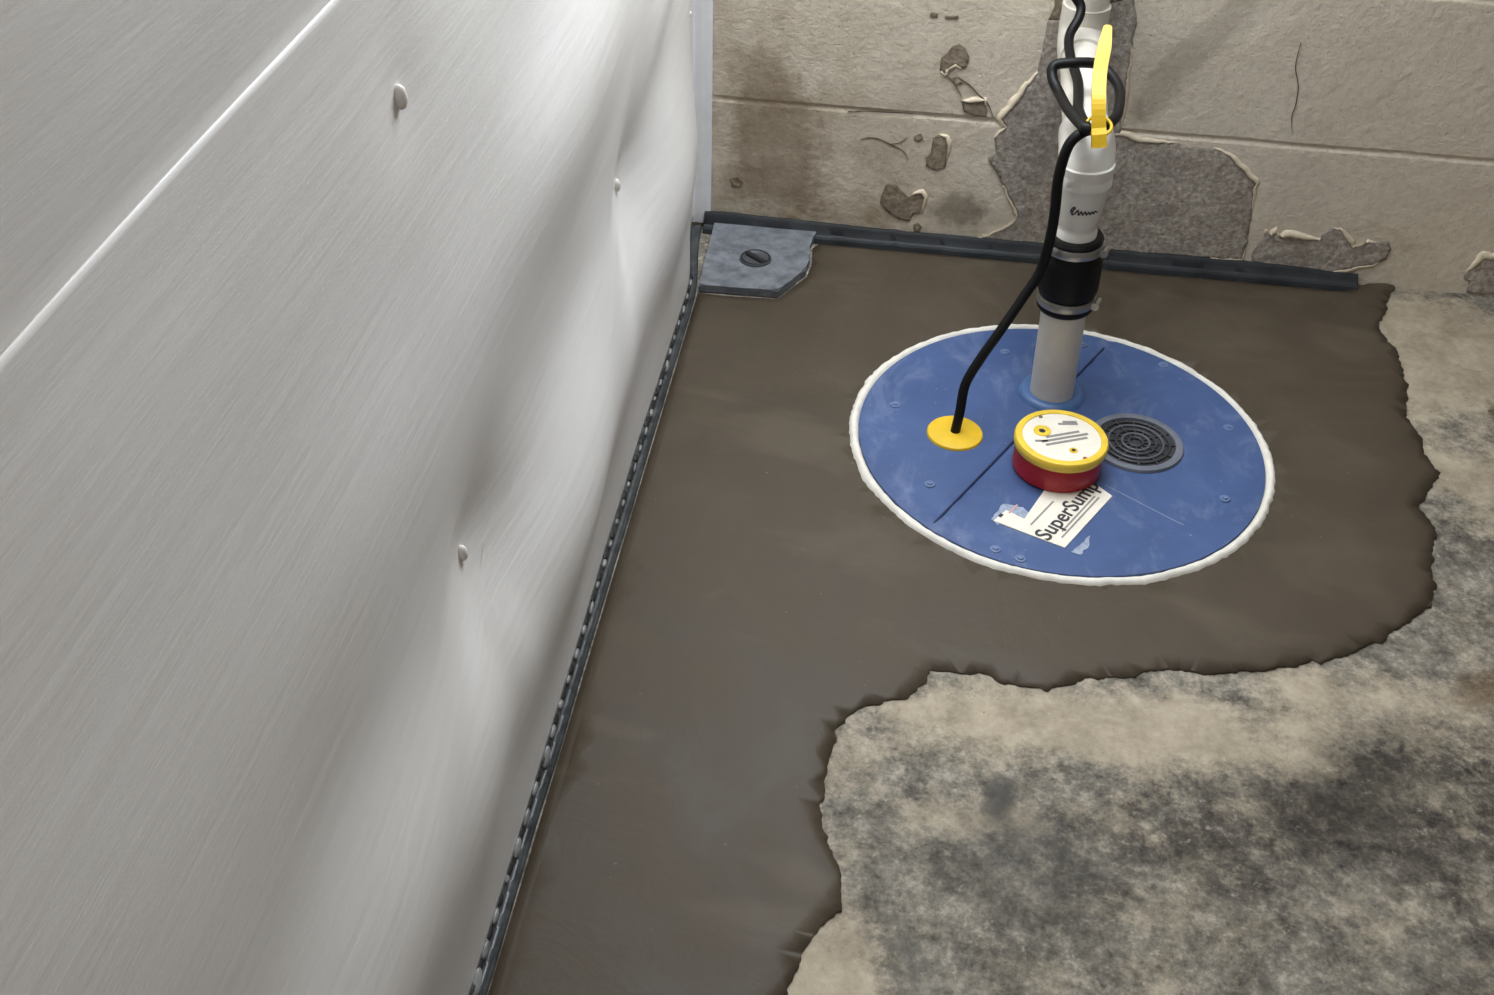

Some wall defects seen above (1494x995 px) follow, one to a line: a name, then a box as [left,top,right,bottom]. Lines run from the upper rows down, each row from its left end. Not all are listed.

spalling [914,133,952,171]
spalling [940,0,1063,243]
spalling [1097,0,1391,273]
spalling [880,183,928,232]
spalling [1464,251,1494,295]